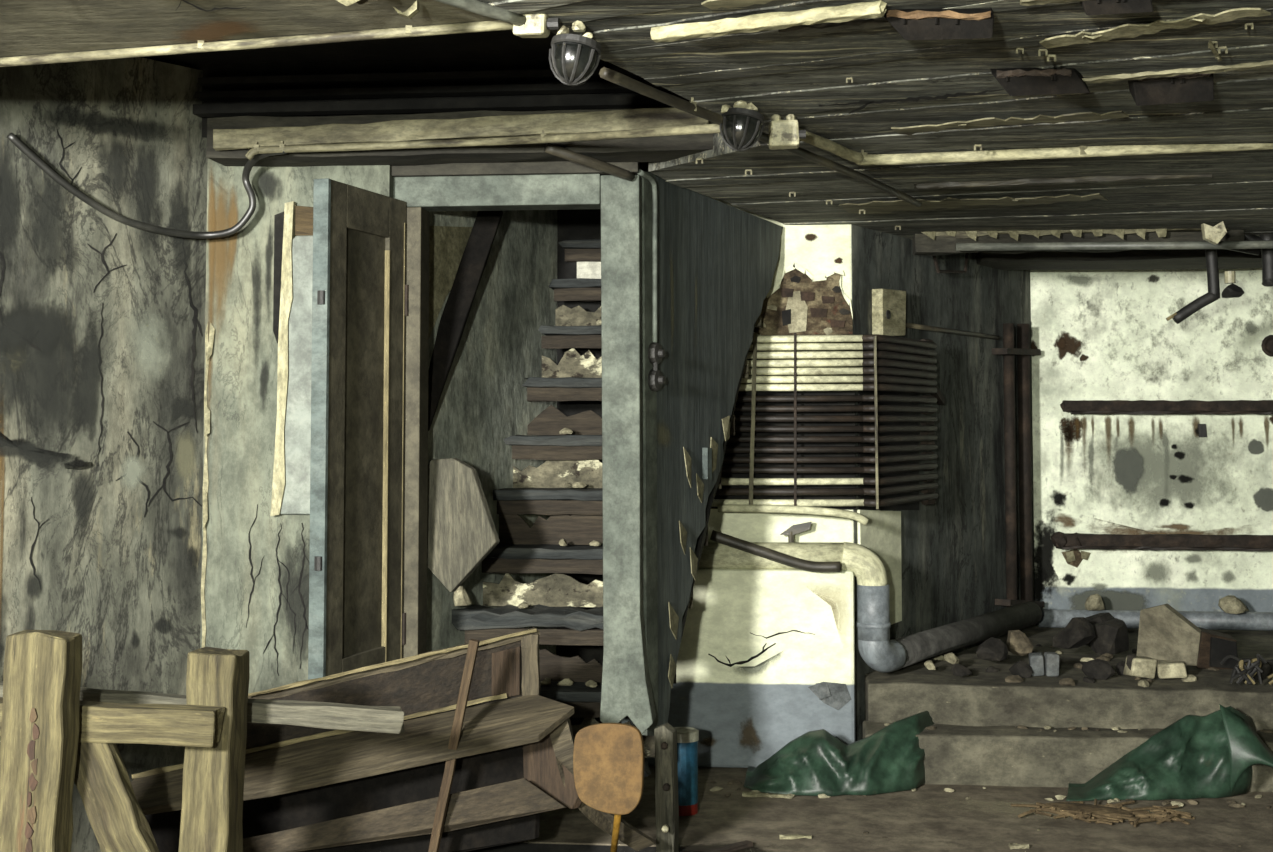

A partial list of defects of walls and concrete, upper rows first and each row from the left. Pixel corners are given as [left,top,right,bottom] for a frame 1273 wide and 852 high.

water stain [0,157,75,272]
water stain [57,108,190,292]
spalling [754,262,853,335]
water stain [0,304,100,533]
crack [87,233,203,517]
rust [1059,417,1134,458]
water stain [1089,435,1227,503]
water stain [27,576,41,596]
crack [246,504,309,676]
water stain [1034,491,1145,611]
water stain [1146,564,1165,581]
water stain [1187,556,1199,580]